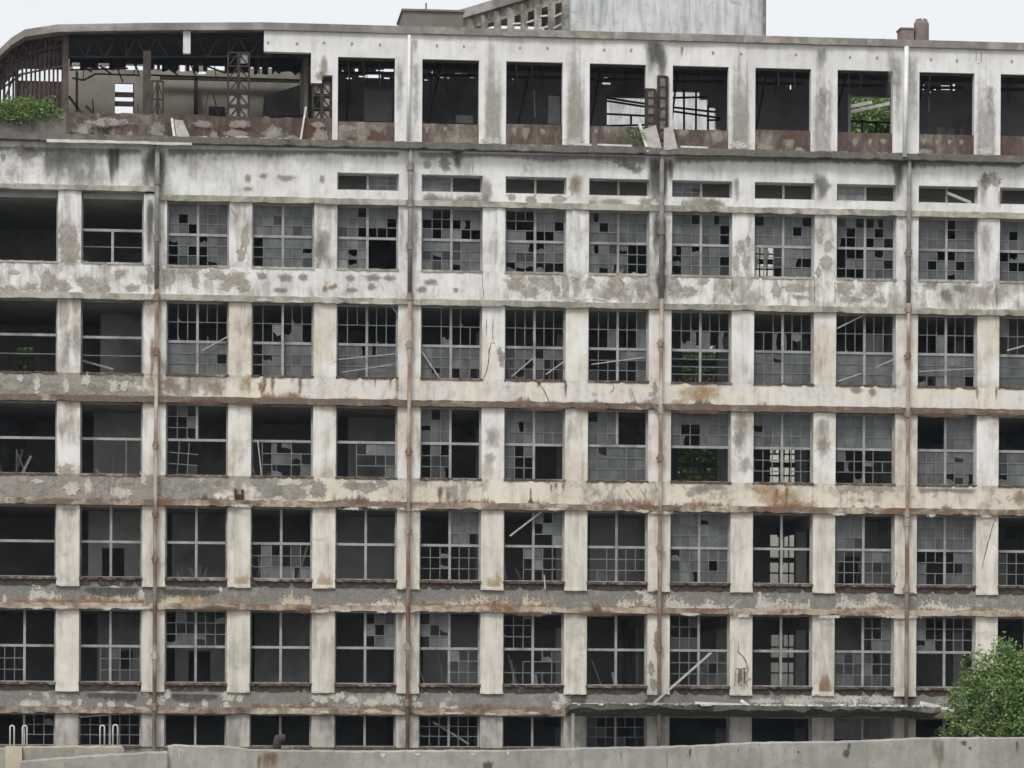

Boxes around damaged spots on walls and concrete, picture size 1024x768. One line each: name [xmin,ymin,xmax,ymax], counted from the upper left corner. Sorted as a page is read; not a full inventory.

water stain [648,43,666,75]
water stain [421,81,1020,204]
peeling [0,222,269,301]
peeling [507,270,649,301]
crack [482,277,495,380]
corrosion [180,377,306,406]
peeling [0,464,228,499]
peeling [231,477,326,508]
corrosion [431,487,495,503]
peeling [280,590,557,614]
peeling [97,690,245,708]
peeling [280,692,423,714]